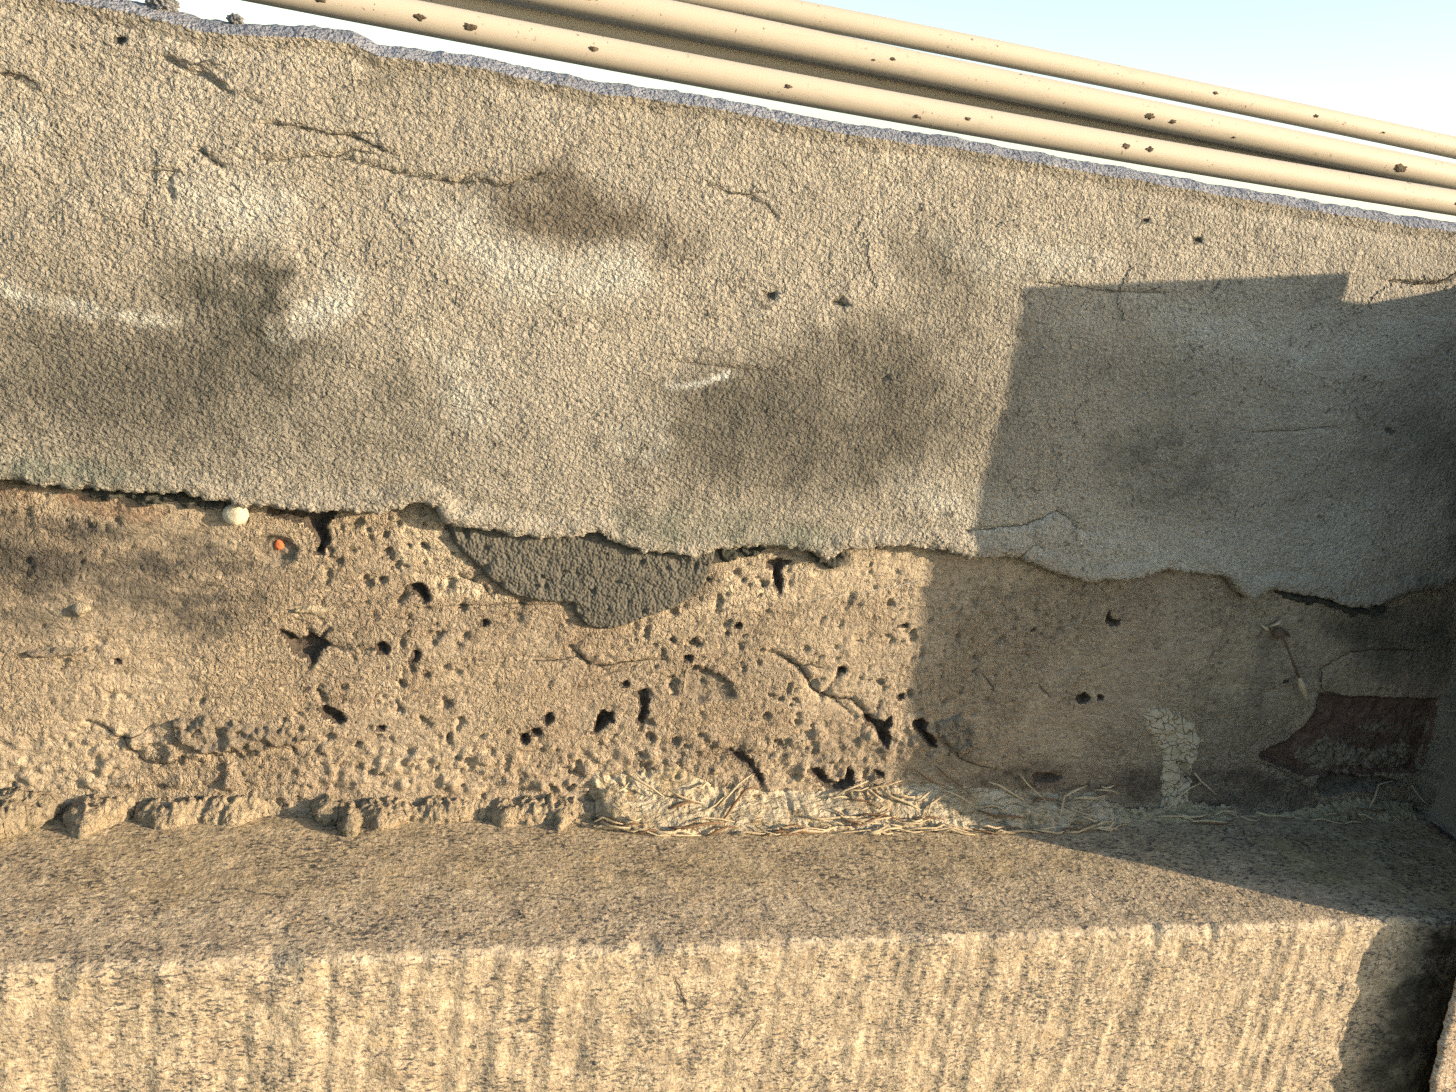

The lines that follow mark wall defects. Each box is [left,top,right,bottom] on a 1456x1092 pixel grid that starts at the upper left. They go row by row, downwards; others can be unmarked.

crack [0,72,35,87]
water stain [345,50,458,108]
water stain [0,87,66,175]
crack [265,121,563,187]
crack [1395,273,1456,284]
water stain [0,128,1456,699]
spalling [245,533,298,567]
spalling [683,665,738,704]
flaking render [171,715,313,756]
spalling [1259,692,1439,798]